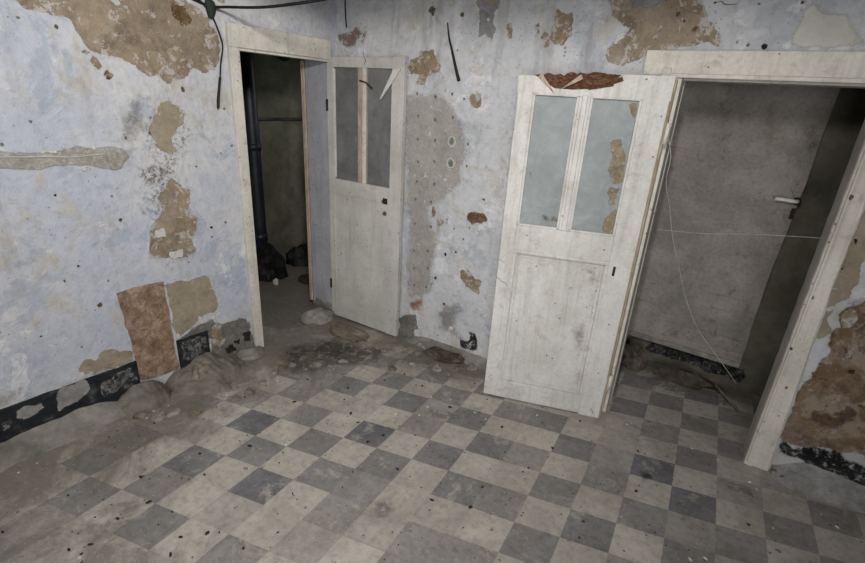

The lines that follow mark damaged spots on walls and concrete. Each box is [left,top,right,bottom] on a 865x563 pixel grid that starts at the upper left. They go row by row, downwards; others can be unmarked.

peeling [11,0,222,92]
peeling [532,8,578,56]
peeling [599,0,738,69]
peeling [148,99,187,155]
peeling [146,177,199,262]
spalling [780,297,865,461]